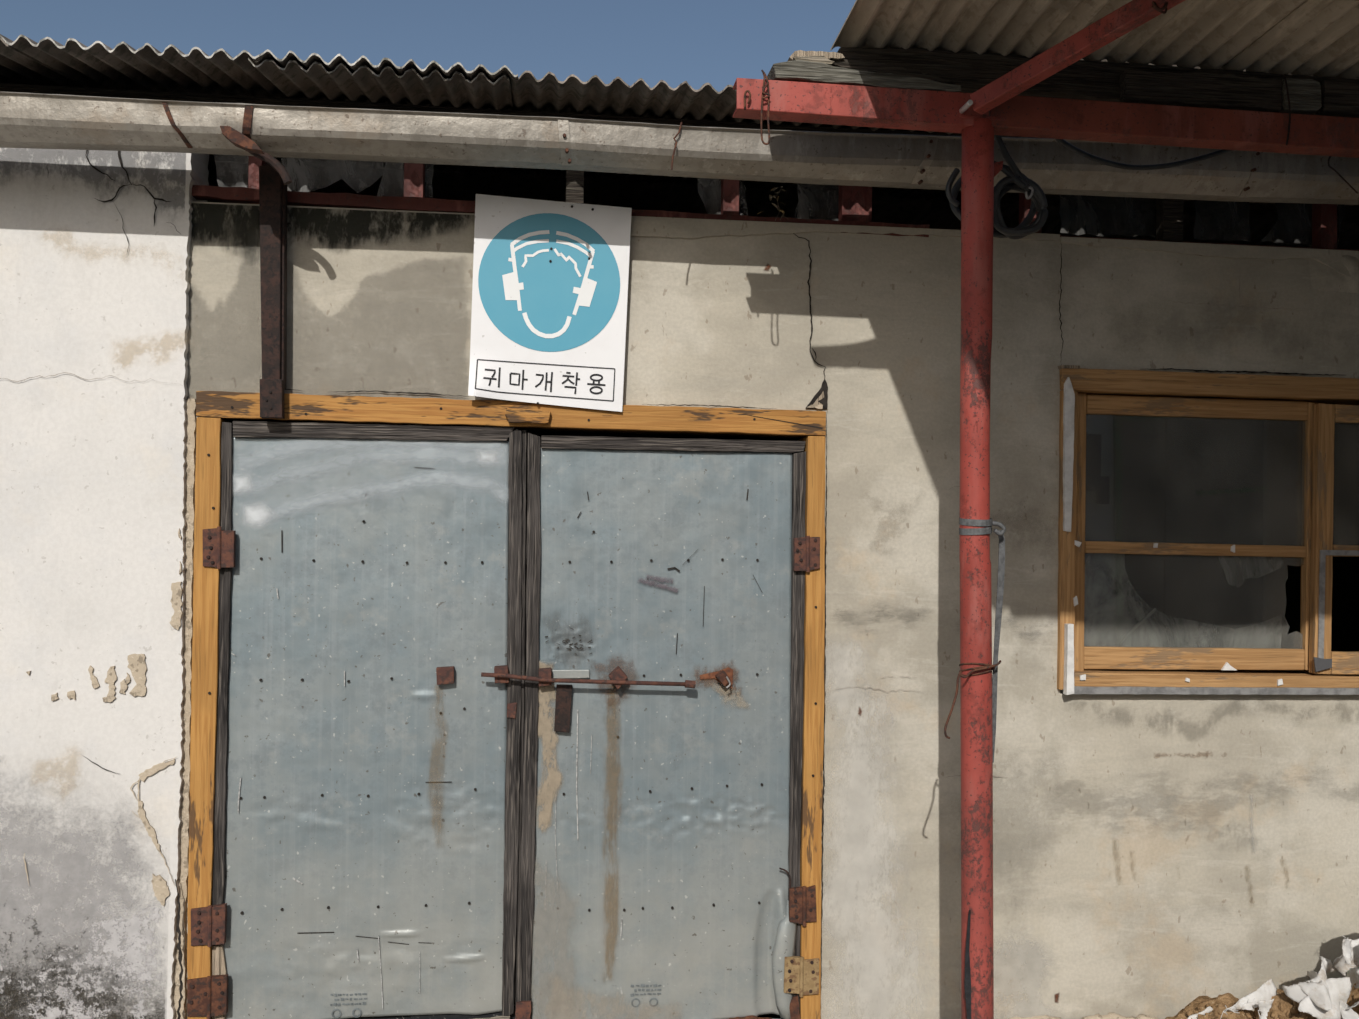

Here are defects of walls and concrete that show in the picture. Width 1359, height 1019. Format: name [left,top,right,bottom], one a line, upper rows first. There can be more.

crack [85,150,181,252]
damp [191,203,260,253]
damp [287,207,474,249]
crack [793,233,826,379]
peeling [51,691,76,701]
peeling [88,654,147,702]
flaking render [138,399,197,1019]
damp [0,807,165,1019]